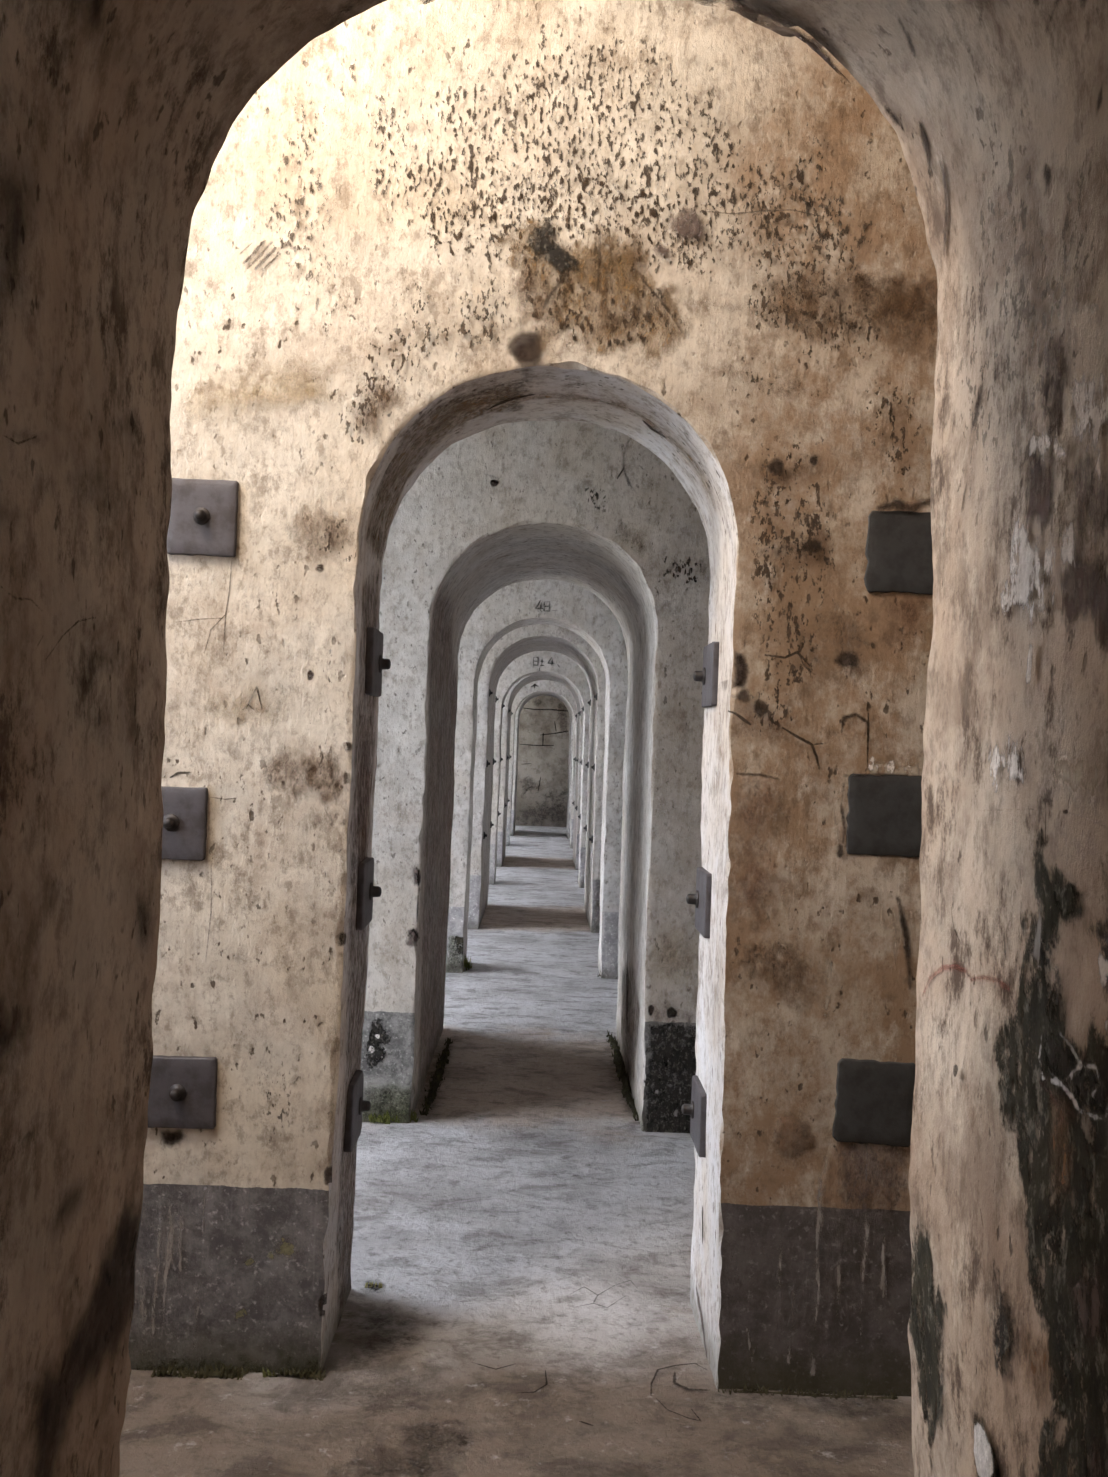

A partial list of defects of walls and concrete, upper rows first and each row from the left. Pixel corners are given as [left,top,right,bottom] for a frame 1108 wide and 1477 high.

leakage [253,104,345,313]
leakage [339,25,935,442]
leakage [867,386,919,491]
leakage [993,814,1108,1477]